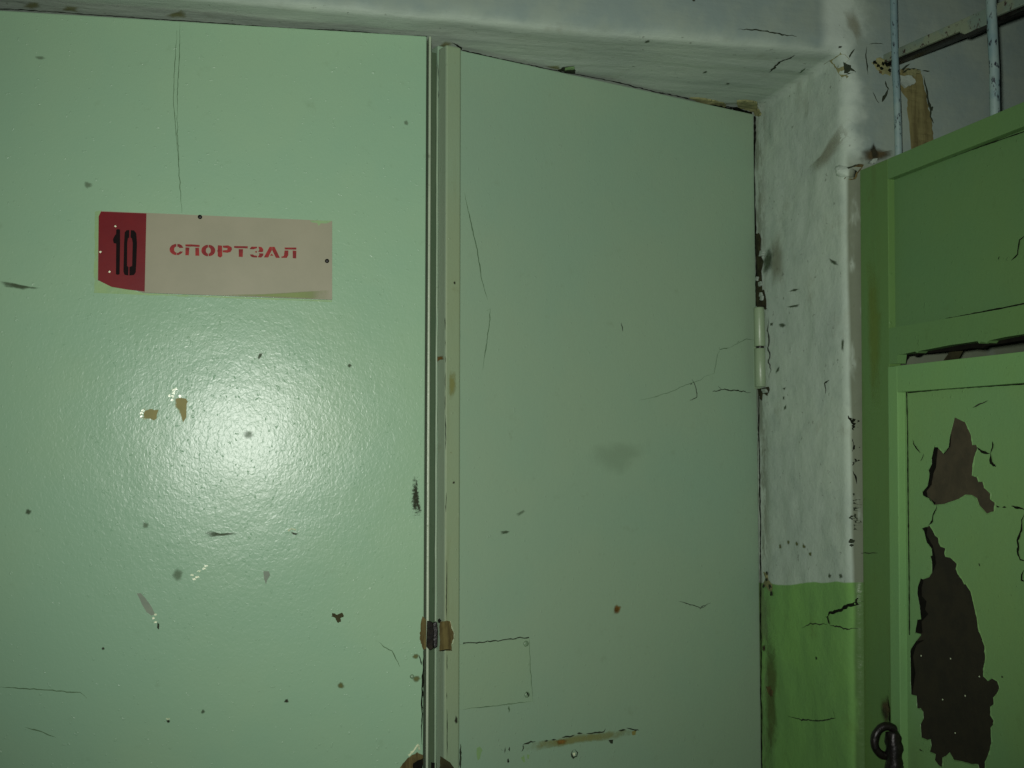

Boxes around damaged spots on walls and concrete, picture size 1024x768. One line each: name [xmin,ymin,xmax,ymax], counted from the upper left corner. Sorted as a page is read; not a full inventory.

crack [742,29,805,73]
crack [0,9,380,206]
spalling [690,97,762,117]
spalling [872,57,934,149]
peeling [140,408,158,420]
peeling [168,388,188,422]
peeling [922,417,996,515]
crack [643,339,762,768]
crack [806,598,863,630]
peeling [910,525,1000,768]